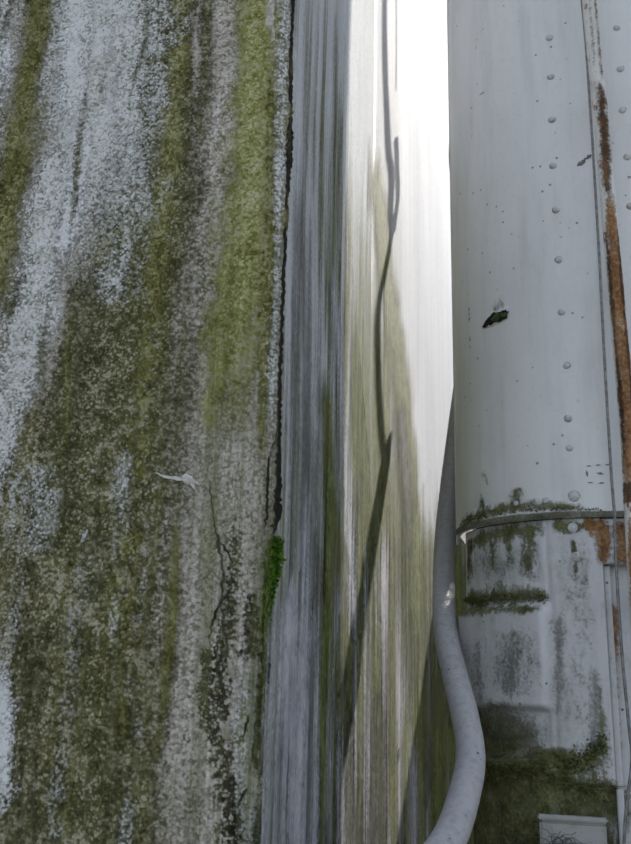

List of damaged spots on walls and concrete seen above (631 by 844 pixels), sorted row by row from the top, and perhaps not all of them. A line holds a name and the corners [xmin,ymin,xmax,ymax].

leakage [257,0,294,449]
leakage [0,0,214,844]
leakage [199,264,234,431]
leakage [196,647,219,734]
crack [208,482,235,658]
leakage [239,593,260,660]
leakage [232,811,248,844]